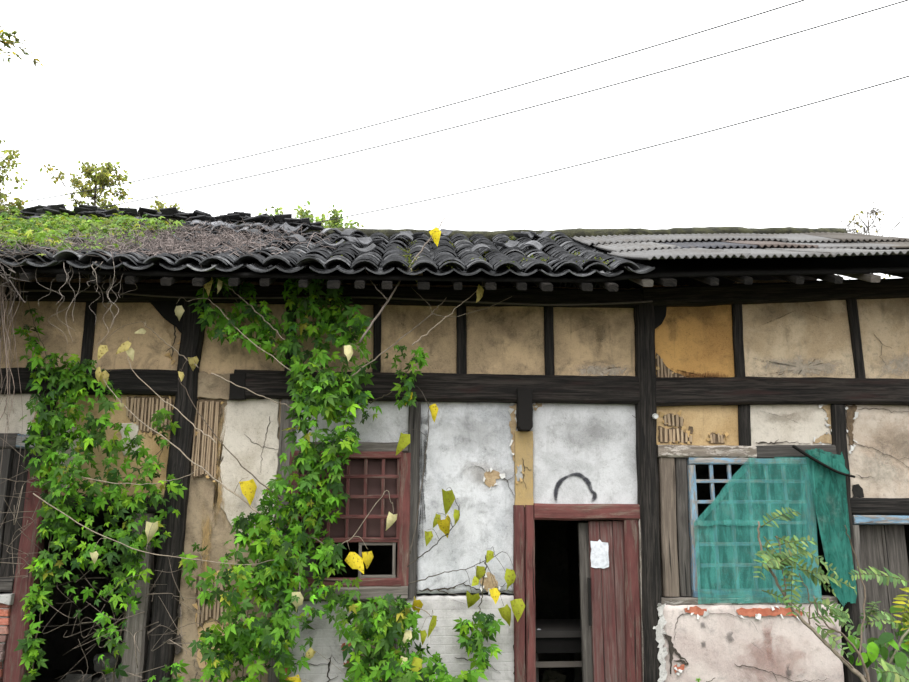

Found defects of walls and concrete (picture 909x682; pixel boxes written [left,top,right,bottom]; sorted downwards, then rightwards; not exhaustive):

flaking render [657,410,694,445]
flaking render [508,403,524,484]
flaking render [483,468,505,489]
spalling [684,606,710,619]
spalling [736,606,803,621]
crack [735,664,828,682]